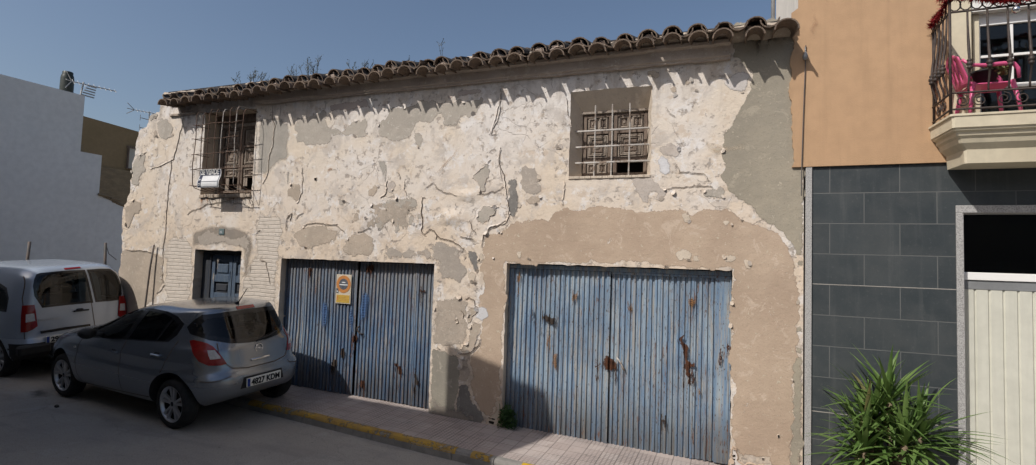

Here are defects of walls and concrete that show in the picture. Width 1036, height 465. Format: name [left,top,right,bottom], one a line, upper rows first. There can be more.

crack [125,104,281,294]
crack [398,88,509,253]
flaking render [242,37,806,465]
corrosion [532,309,558,381]
corrosion [595,356,619,382]
corrosion [679,335,700,397]